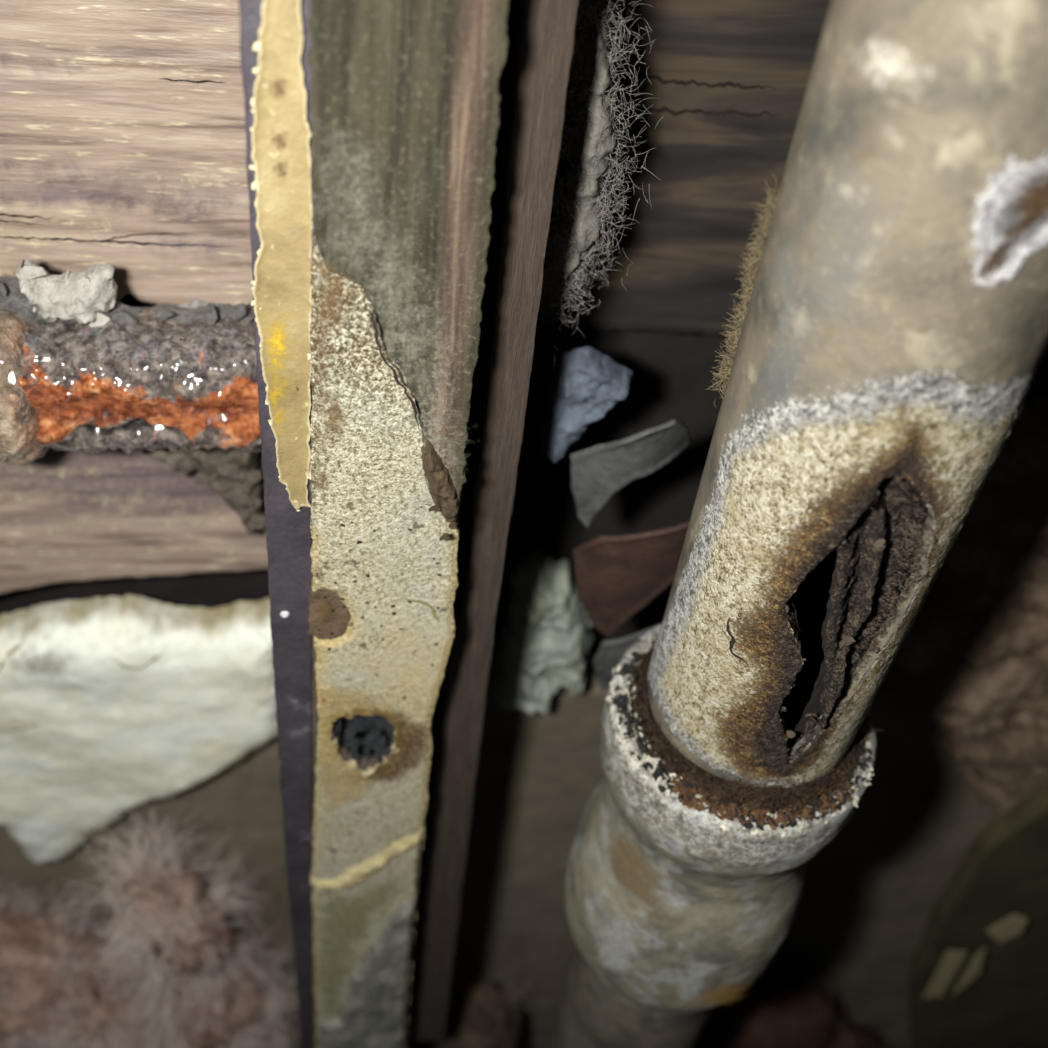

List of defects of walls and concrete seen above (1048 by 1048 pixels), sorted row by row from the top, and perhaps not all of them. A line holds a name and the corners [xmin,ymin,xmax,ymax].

peeling [307,590,351,640]
corrosion [712,405,955,783]